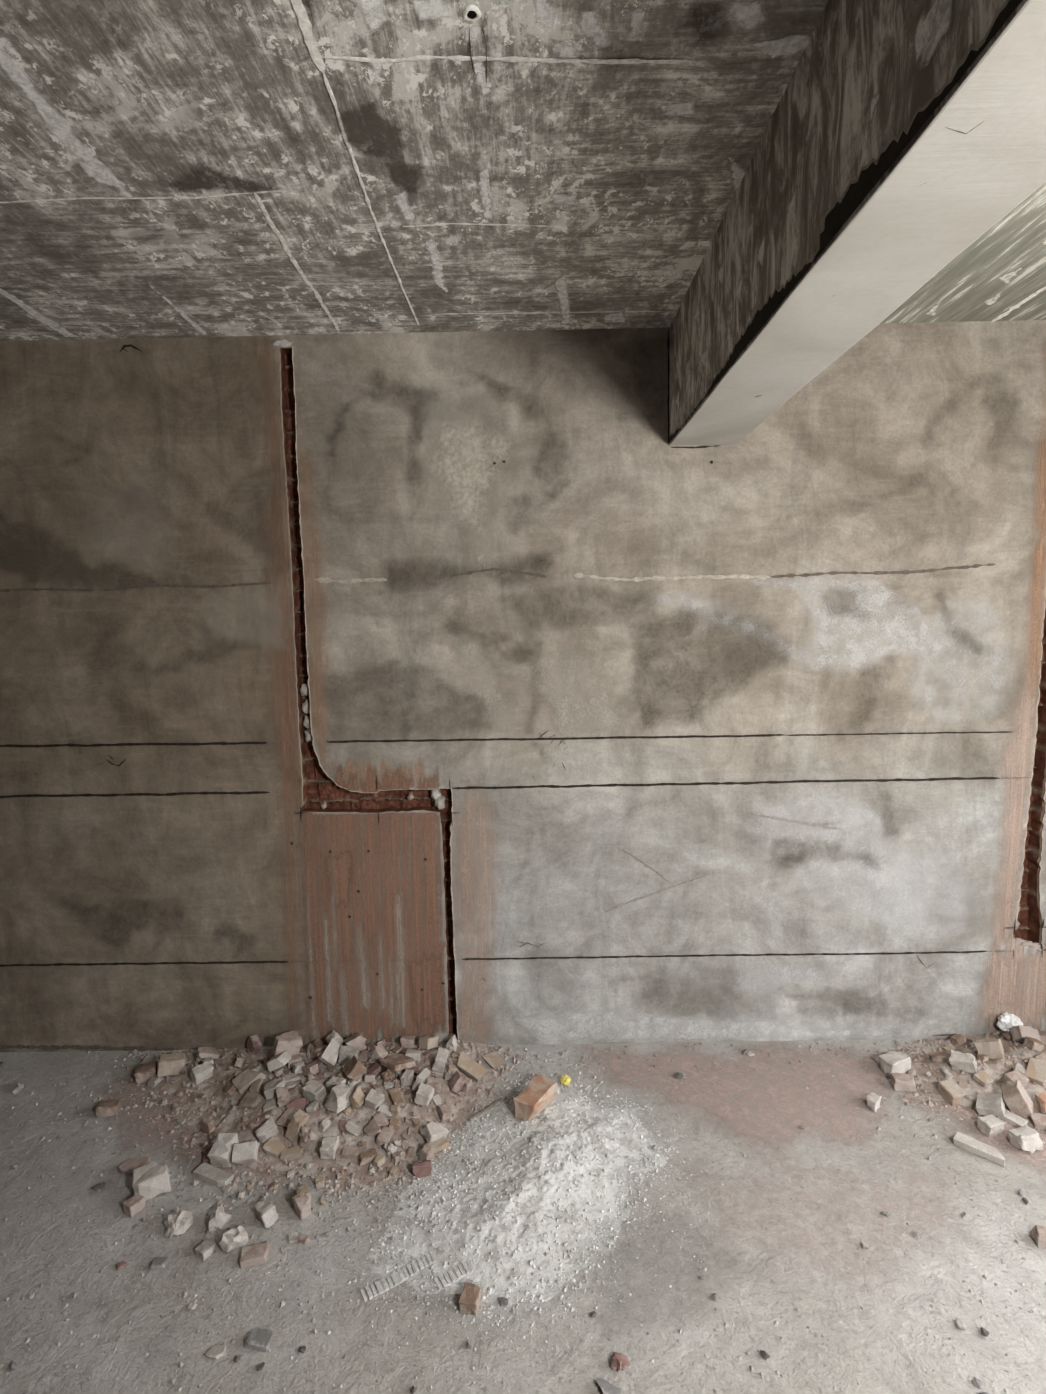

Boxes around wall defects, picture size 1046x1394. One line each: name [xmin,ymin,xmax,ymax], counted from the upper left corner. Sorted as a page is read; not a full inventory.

peeling [535,0,608,58]
peeling [473,62,492,95]
peeling [660,102,695,115]
peeling [669,0,1022,443]